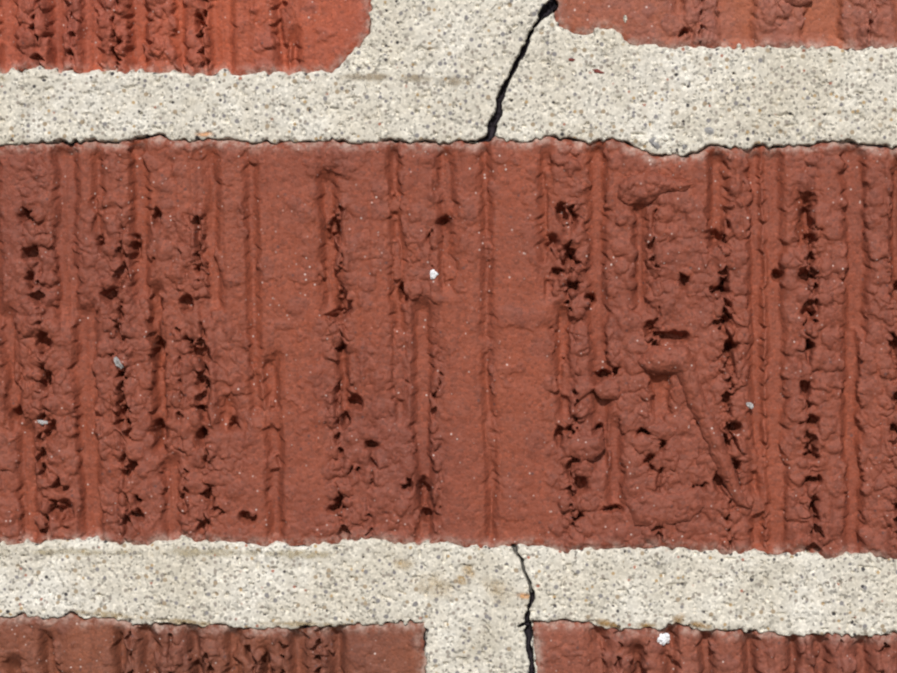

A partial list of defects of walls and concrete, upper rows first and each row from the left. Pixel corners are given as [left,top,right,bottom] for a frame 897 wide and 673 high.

crack [465,0,557,144]
crack [512,545,535,673]